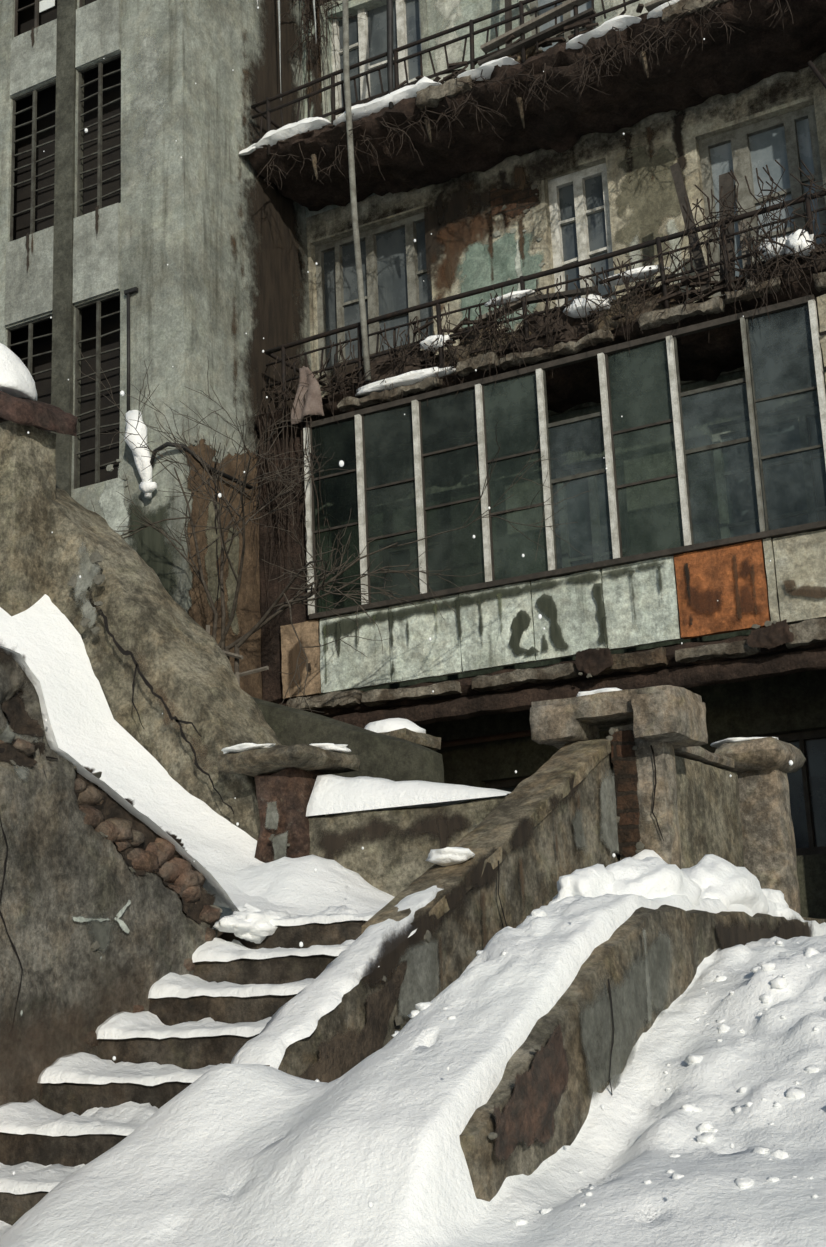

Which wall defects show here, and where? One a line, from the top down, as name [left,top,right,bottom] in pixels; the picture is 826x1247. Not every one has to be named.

peeling [605,0,653,19]
peeling [458,185,545,332]
damp [288,561,664,687]
rust [684,555,762,625]
damp [783,580,826,598]
spalling [0,689,45,780]
crack [87,586,234,814]
spalling [74,766,222,941]
spalling [84,1031,99,1047]